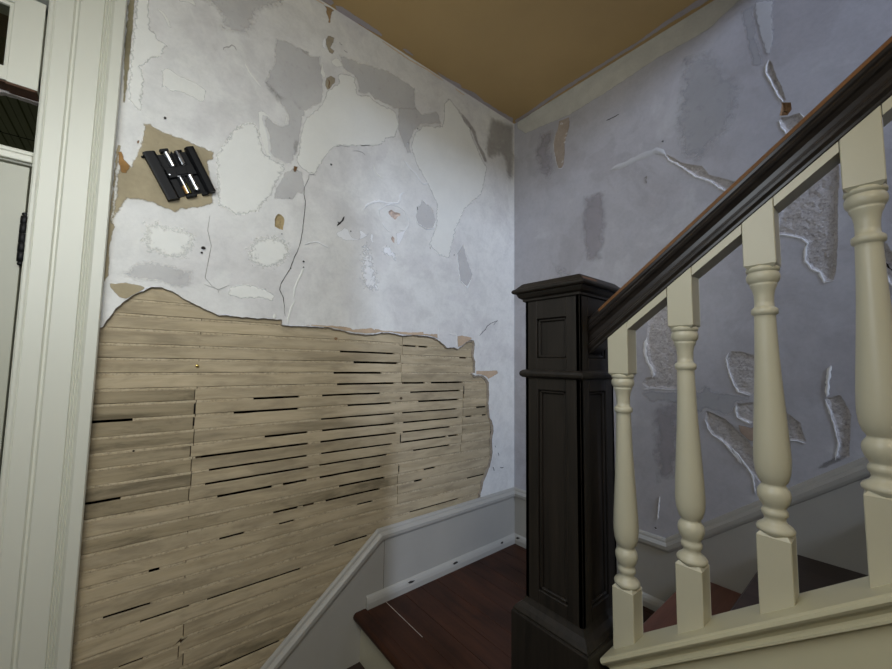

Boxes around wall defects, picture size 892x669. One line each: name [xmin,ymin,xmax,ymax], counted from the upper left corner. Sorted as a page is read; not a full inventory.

spalling [764,60,804,135]
spalling [665,154,735,191]
spalling [779,165,840,283]
spalling [884,242,892,286]
spalling [642,306,677,390]
spalling [99,287,498,498]
spalling [704,351,761,492]